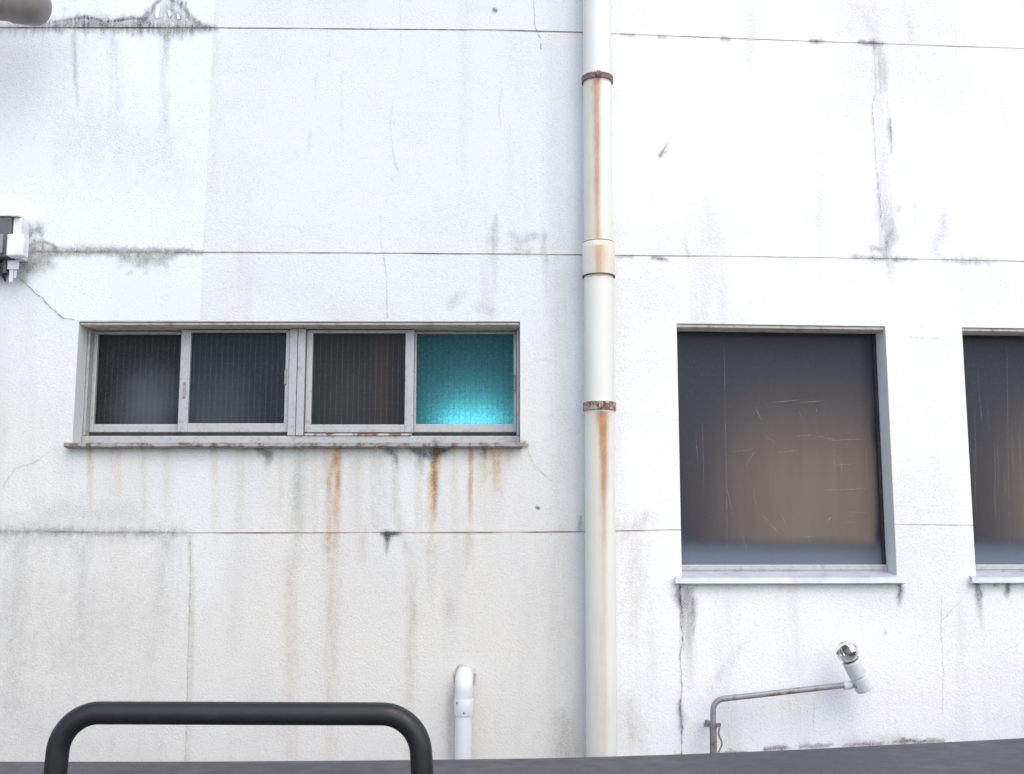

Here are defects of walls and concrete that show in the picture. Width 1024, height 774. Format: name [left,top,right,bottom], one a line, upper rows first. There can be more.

water stain [49,15,215,33]
mould [19,226,202,278]